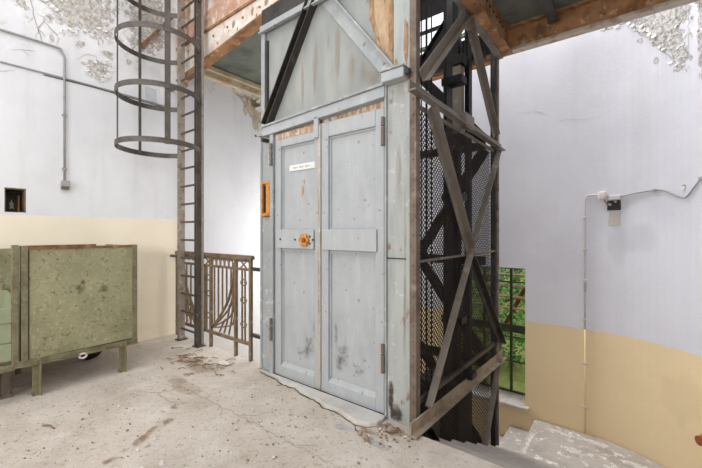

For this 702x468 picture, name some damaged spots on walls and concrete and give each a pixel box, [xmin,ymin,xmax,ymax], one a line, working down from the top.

spalling [37,0,177,82]
flaking render [600,0,702,78]
crack [133,377,335,466]
crack [261,372,370,432]